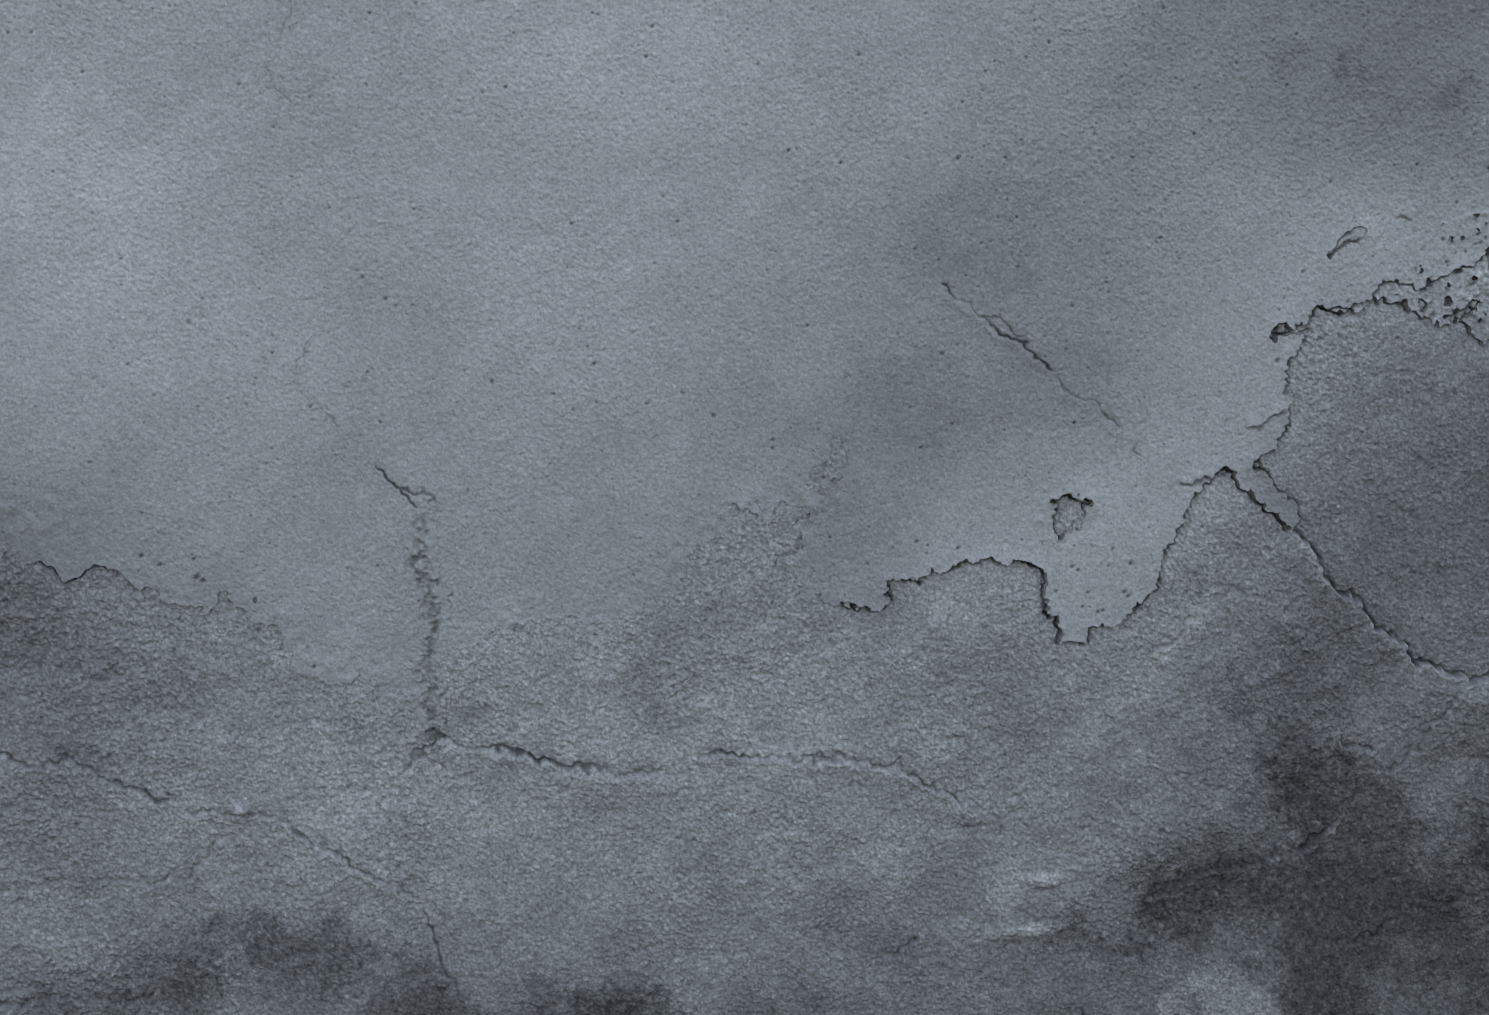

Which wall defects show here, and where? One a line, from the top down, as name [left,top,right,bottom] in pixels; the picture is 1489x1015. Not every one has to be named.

crack [292,331,986,817]
flaking render [0,207,1489,1015]
crack [934,277,1149,463]